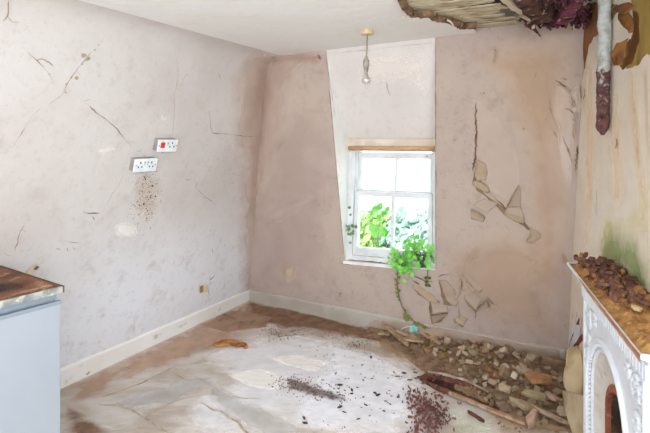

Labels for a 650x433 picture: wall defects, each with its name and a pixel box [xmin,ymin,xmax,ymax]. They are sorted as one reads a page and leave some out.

spalling [397,0,477,32]
peeling [610,0,650,70]
crack [14,44,99,145]
peeling [471,105,541,244]
peeling [412,273,493,329]